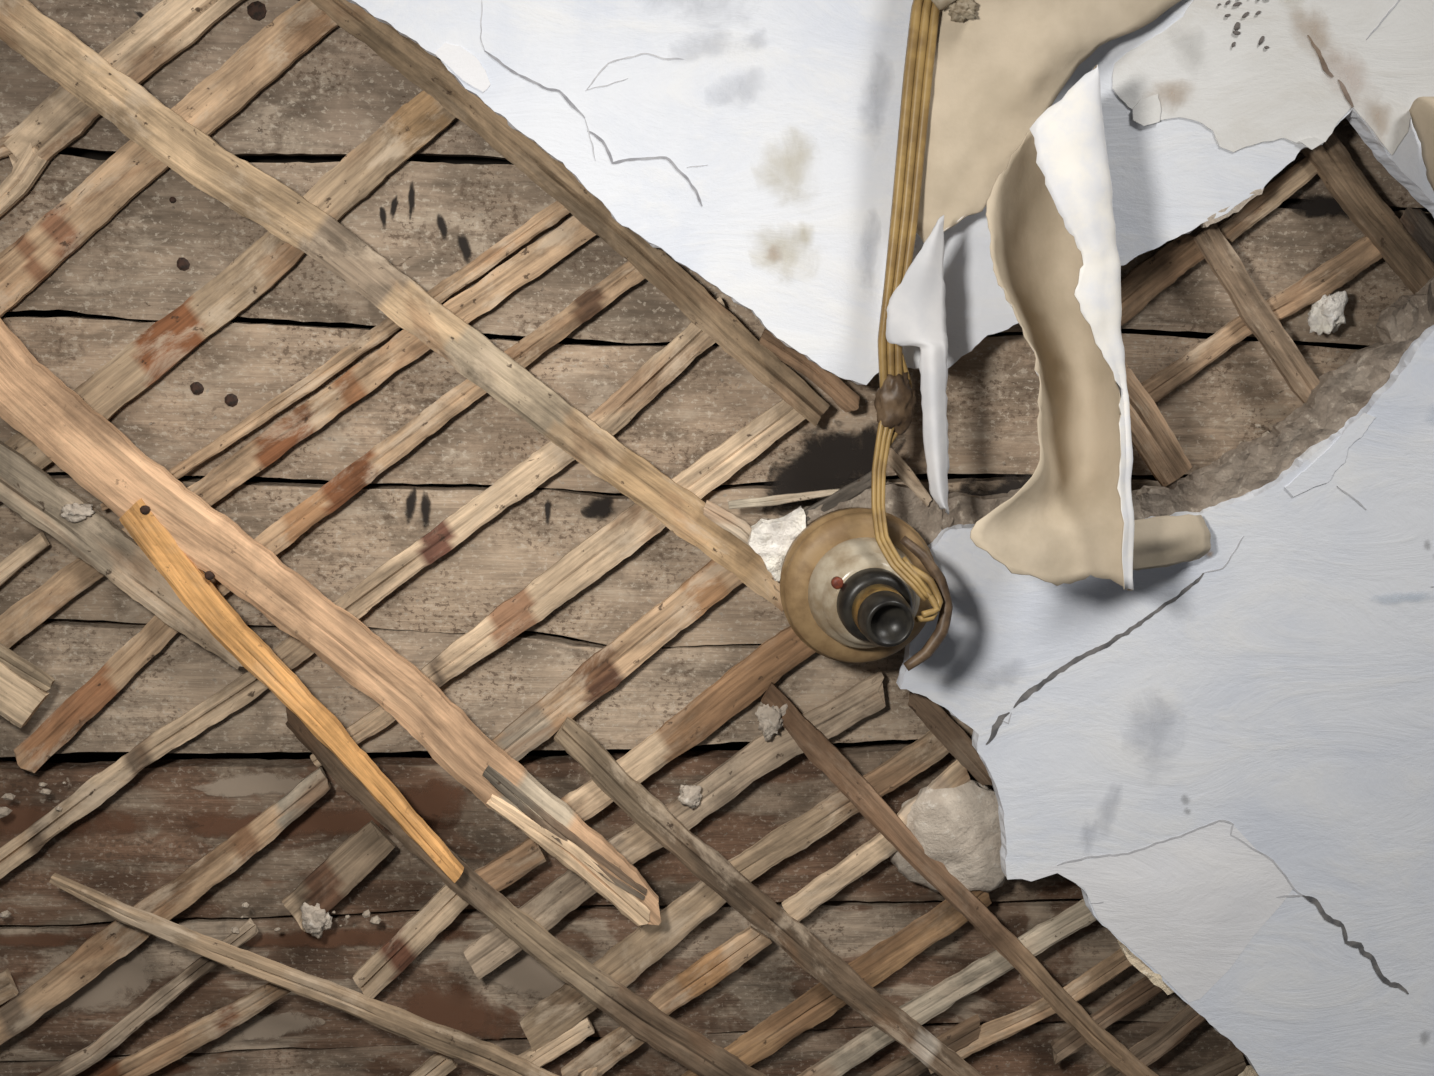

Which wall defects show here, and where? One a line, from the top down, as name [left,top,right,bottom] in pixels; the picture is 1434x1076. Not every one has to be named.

peeling [435,43,491,92]
crack [480,6,706,206]
spalling [748,481,1021,582]
crack [986,536,1244,745]
crack [1057,820,1409,994]
spalling [1117,940,1174,995]
spalling [1238,1065,1259,1076]